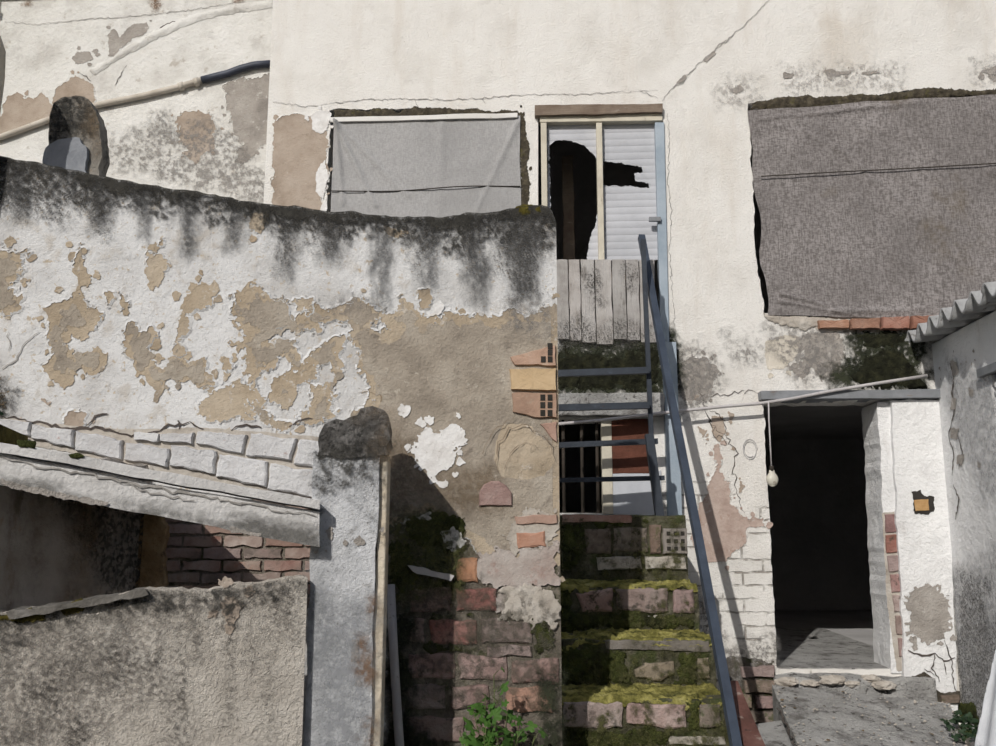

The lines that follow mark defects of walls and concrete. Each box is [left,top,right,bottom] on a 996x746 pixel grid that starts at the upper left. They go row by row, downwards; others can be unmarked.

peeling [0,20,152,137]
damp [0,112,556,329]
peeling [171,73,532,242]
crack [274,0,769,326]
damp [558,316,663,394]
damp [766,326,934,390]
spalling [0,478,108,506]
peeling [36,237,566,746]
damp [310,404,491,505]
flaking render [690,411,773,571]
crack [948,364,970,520]
damp [0,579,318,746]